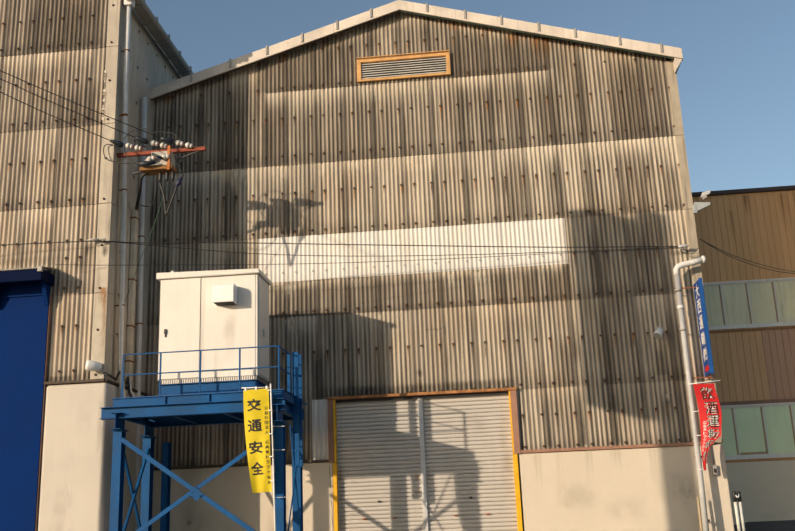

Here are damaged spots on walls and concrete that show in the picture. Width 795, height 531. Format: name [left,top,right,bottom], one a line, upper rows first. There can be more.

leakage [76,12,95,46]
leakage [548,170,564,215]